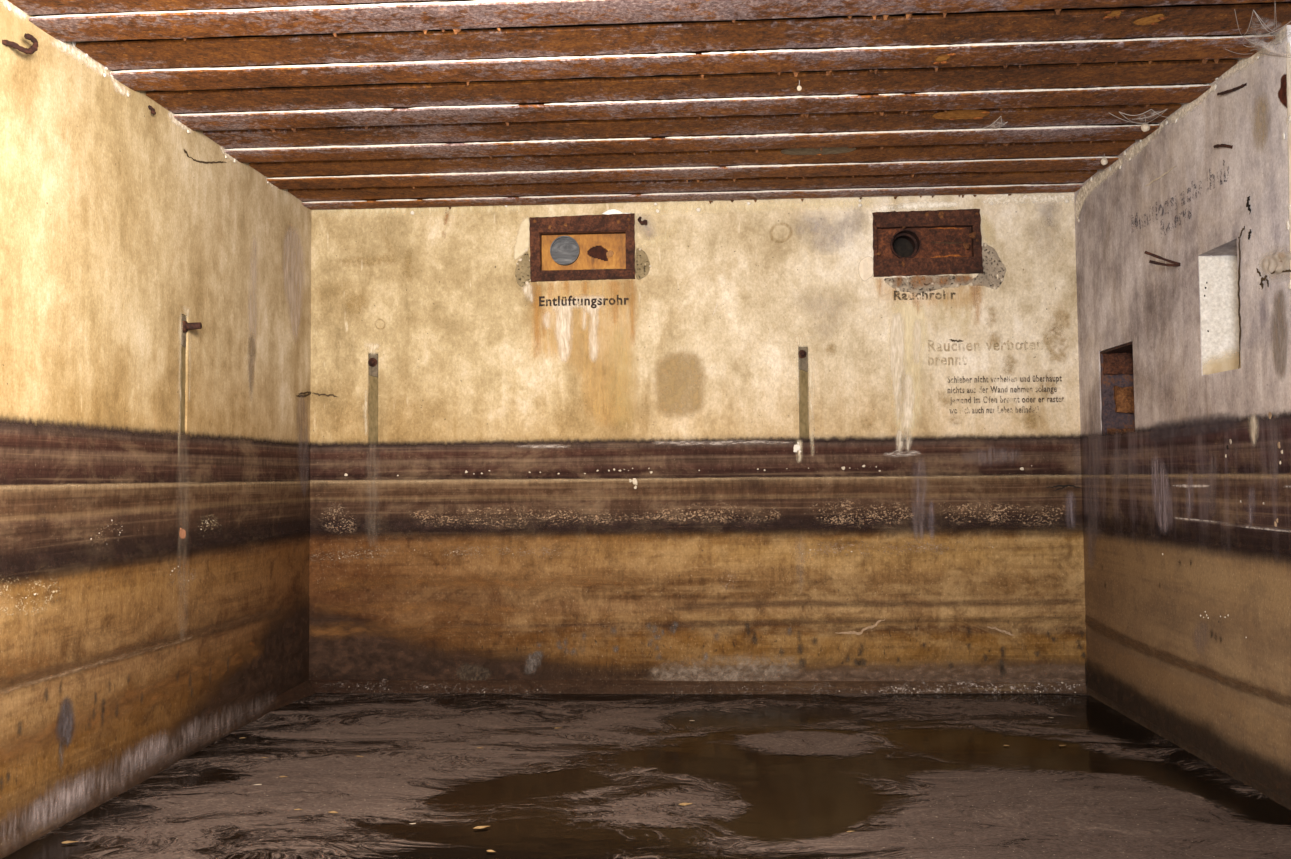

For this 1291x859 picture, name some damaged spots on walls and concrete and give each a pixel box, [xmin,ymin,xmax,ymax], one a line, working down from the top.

leakage [2,0,26,18]
leakage [55,40,130,97]
leakage [488,205,530,260]
leakage [880,202,956,211]
leakage [983,28,1291,375]
flaking render [859,243,1006,294]
leakage [0,297,1291,580]
leakage [0,605,564,835]